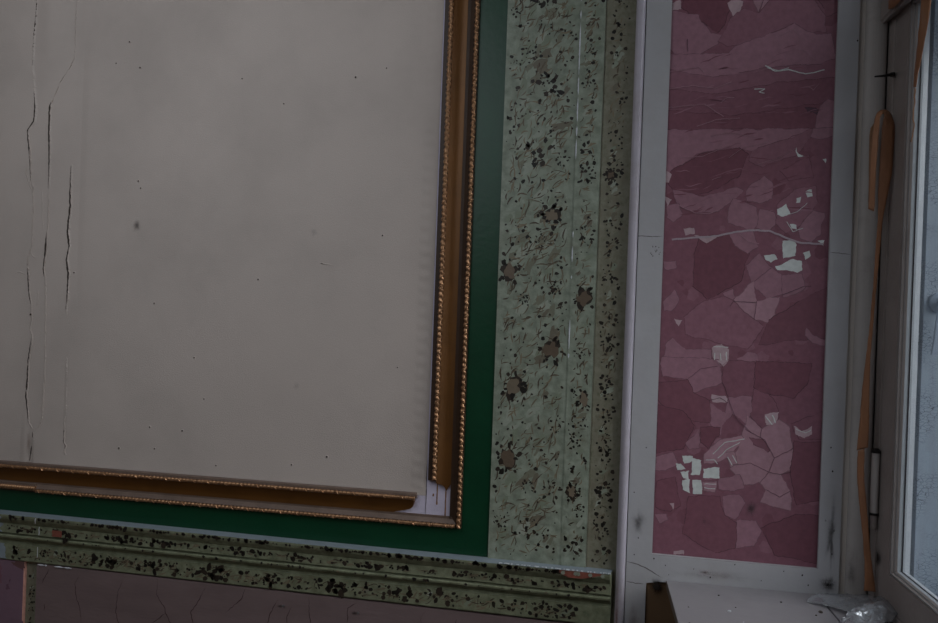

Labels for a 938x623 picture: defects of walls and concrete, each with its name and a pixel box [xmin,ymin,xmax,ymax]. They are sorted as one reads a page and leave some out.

crack [15,0,77,461]